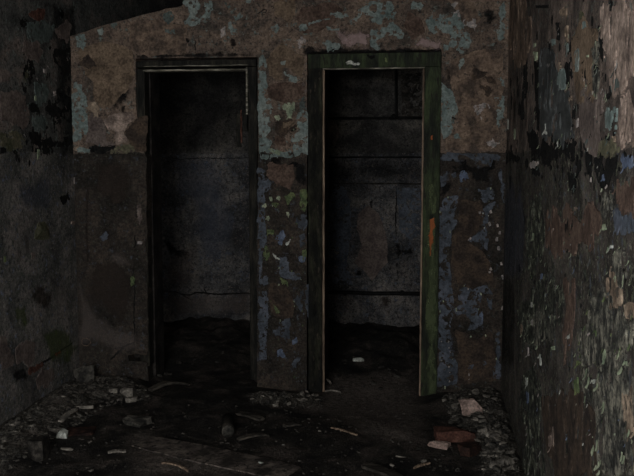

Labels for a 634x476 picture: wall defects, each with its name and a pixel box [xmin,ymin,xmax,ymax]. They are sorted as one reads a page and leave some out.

flaking render [19,0,213,167]
peeling [256,55,309,360]
peeling [297,1,477,70]
peeling [437,195,493,389]
flaking render [440,0,634,236]
flaking render [518,245,634,476]